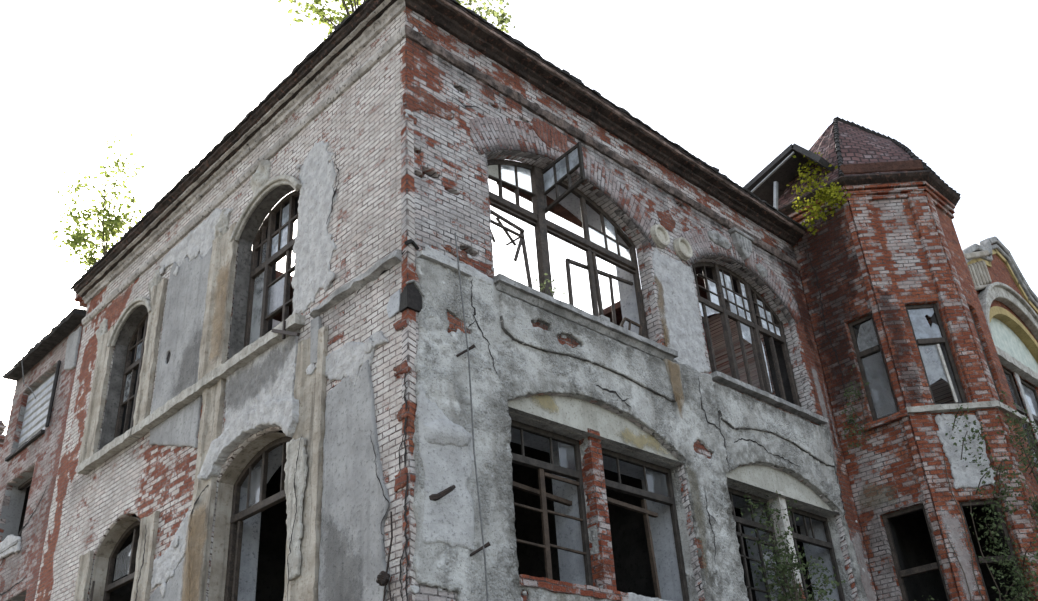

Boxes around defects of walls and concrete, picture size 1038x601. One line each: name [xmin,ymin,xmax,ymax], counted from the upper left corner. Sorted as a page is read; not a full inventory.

spalling [402,84,455,125]
spalling [441,245,495,278]
spalling [447,312,472,334]
crack [467,279,497,373]
spalling [531,321,581,348]
spalling [393,360,412,378]
crack [596,385,632,408]
spalling [397,407,411,422]
crack [698,378,800,472]
peeling [197,318,408,581]
spalling [693,440,712,459]
spalling [411,582,456,601]